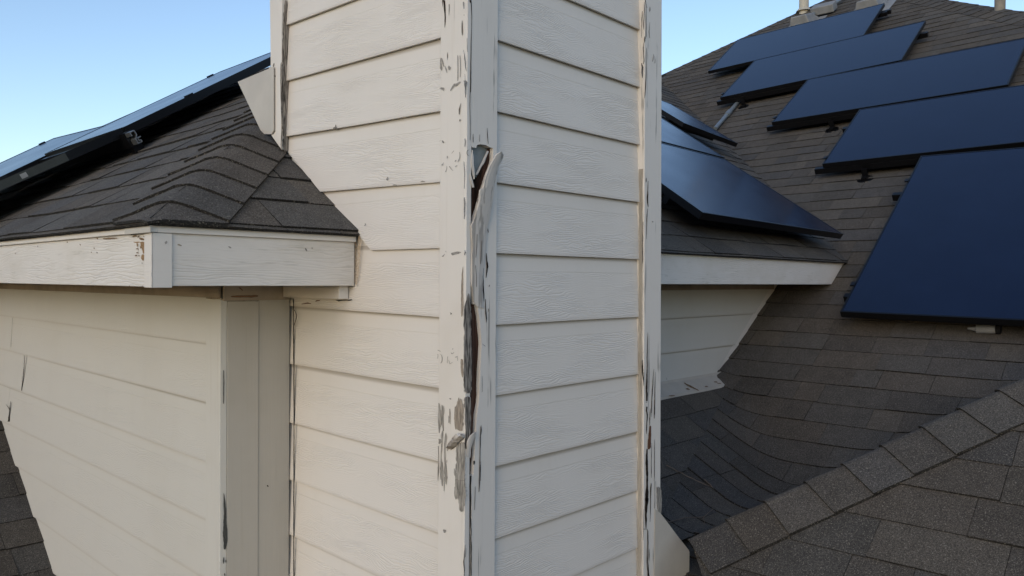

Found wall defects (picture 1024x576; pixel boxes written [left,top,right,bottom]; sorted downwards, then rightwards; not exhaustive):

spalling [438,296,478,512]